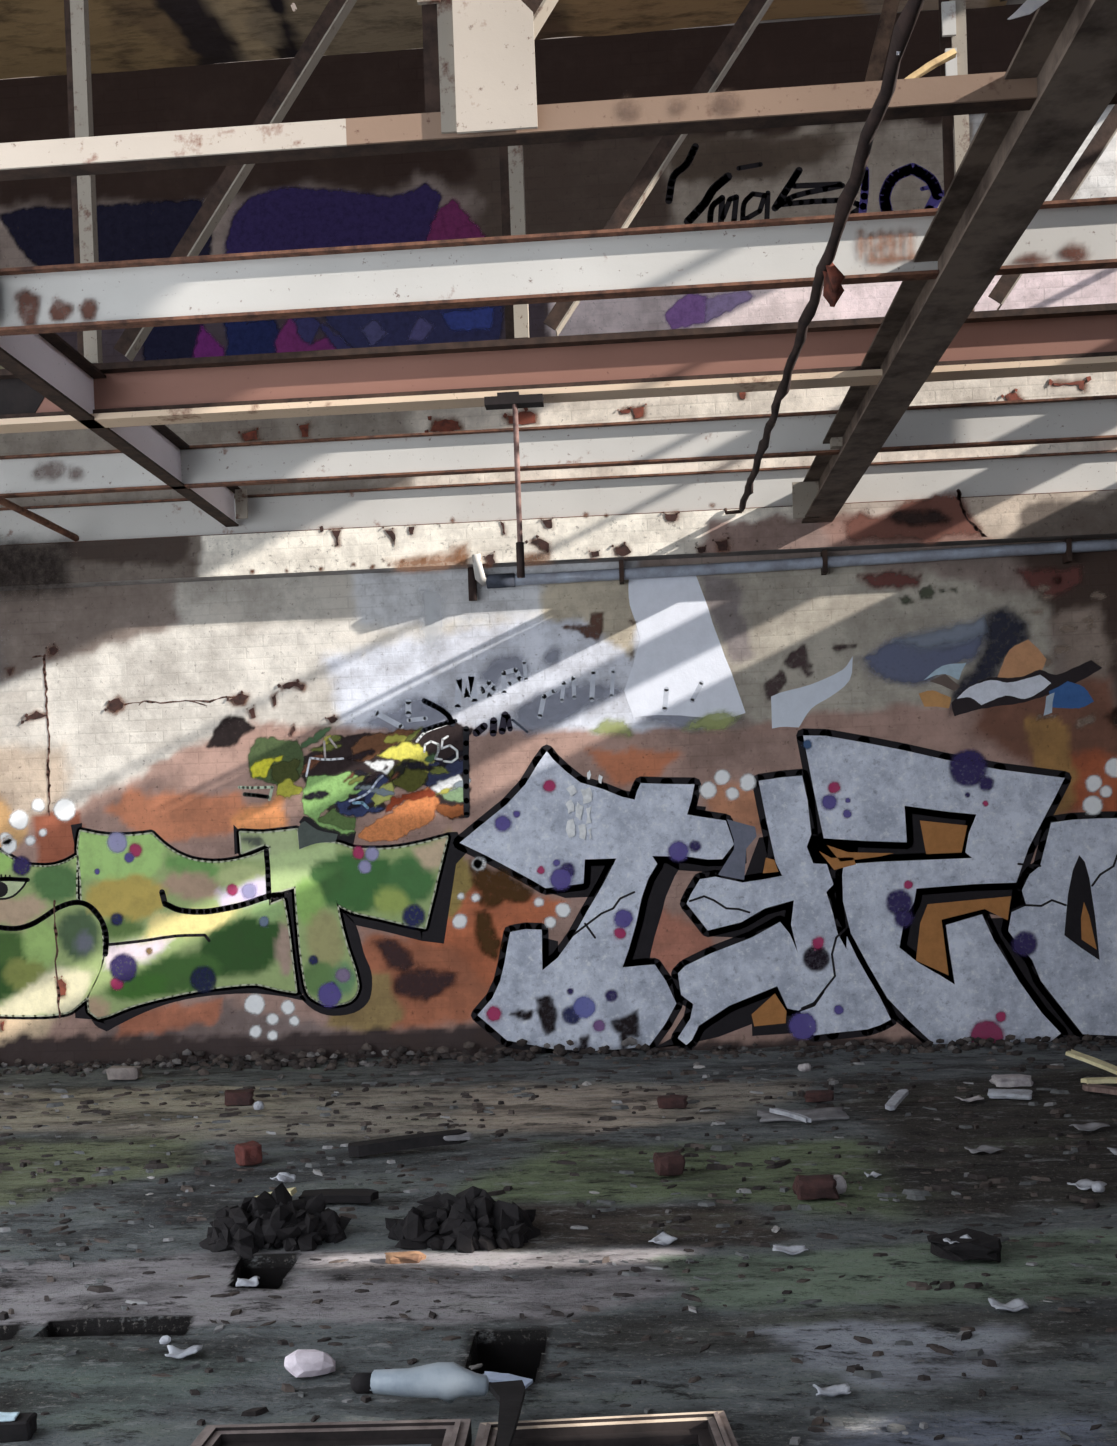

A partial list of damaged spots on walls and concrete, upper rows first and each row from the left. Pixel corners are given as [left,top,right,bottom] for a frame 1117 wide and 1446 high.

rust [15,290,96,326]
rust [352,546,467,569]
peeling [1017,567,1082,614]
peeling [764,645,812,700]
crack [125,696,234,706]
crack [32,654,51,816]
crack [53,900,61,1019]